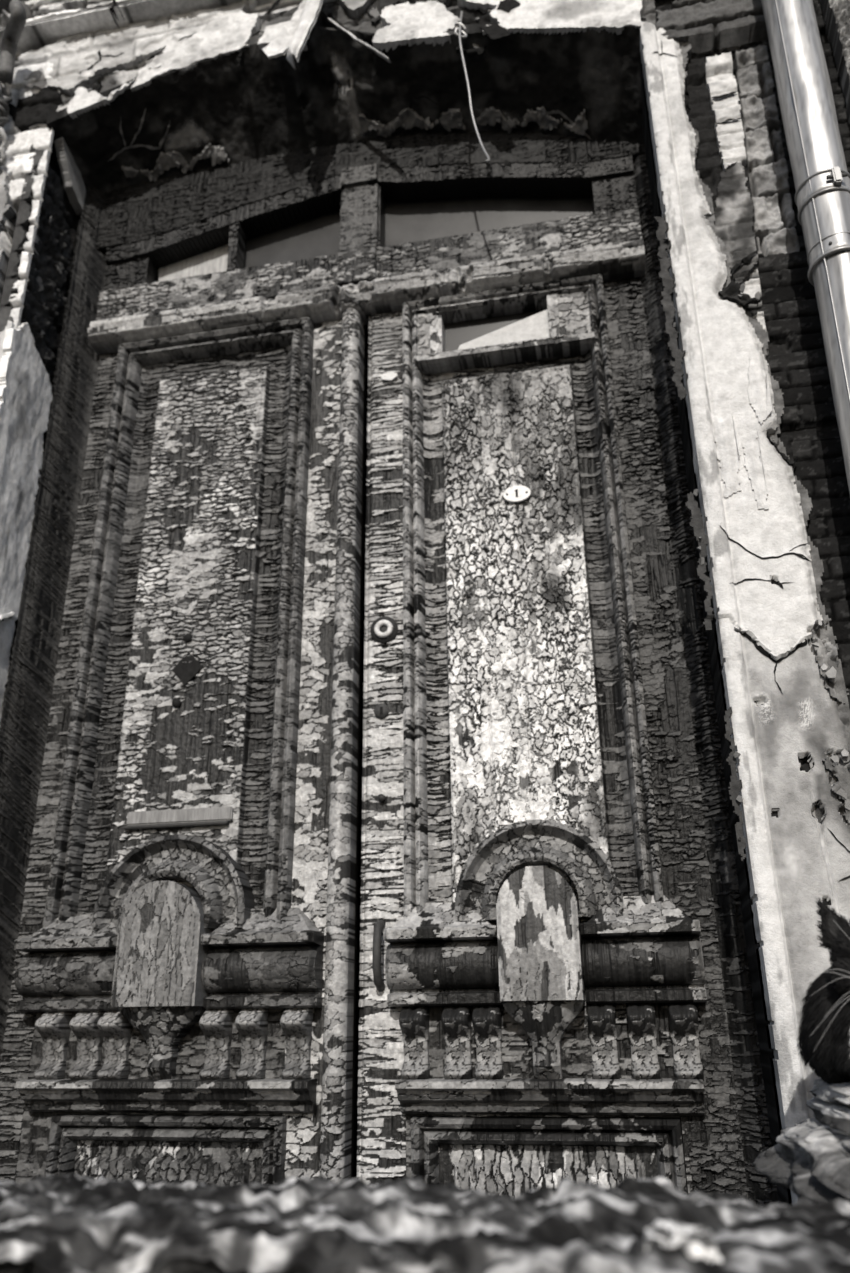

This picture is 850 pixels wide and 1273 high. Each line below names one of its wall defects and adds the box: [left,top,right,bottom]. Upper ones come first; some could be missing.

spalling [366,0,520,58]
spalling [8,88,64,132]
flaking render [358,107,588,138]
spalling [685,52,722,212]
flaking render [122,143,230,182]
spalling [10,212,70,371]
flaking render [654,215,687,402]
spalling [718,281,761,308]
spalling [767,432,798,473]
crack [720,524,812,589]
crack [0,612,15,622]
crack [733,623,826,693]